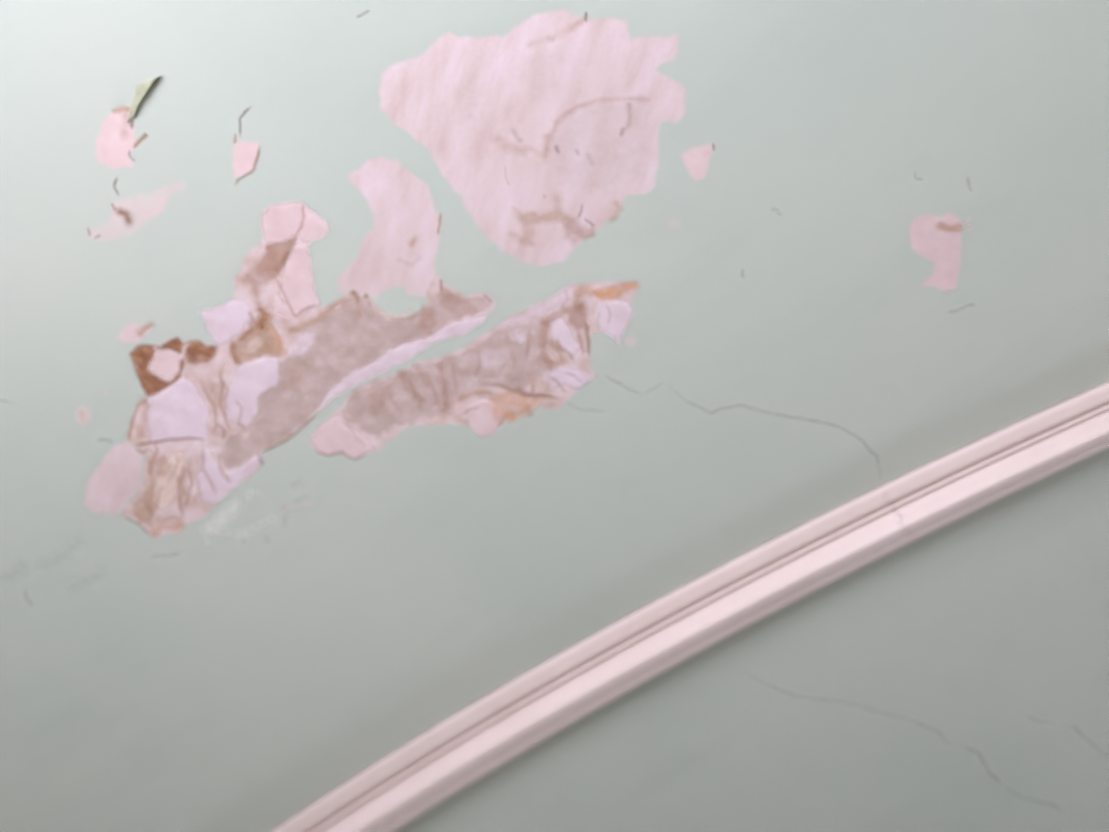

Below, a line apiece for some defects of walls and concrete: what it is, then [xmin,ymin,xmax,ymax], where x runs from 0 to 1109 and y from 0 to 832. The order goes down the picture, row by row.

peeling [677,141,716,183]
peeling [81,7,689,542]
peeling [906,209,970,295]